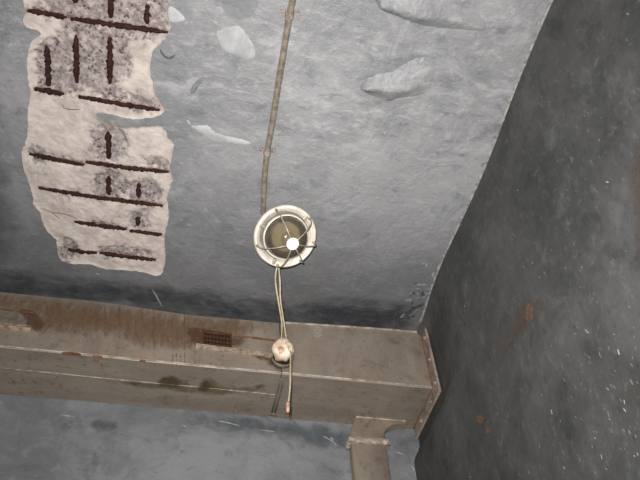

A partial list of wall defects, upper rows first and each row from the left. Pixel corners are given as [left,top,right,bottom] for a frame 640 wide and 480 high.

peeling [217,26,255,59]
spalling [22,0,185,276]
peeling [187,120,251,146]
corrosion [22,309,43,331]
damp [147,378,226,394]